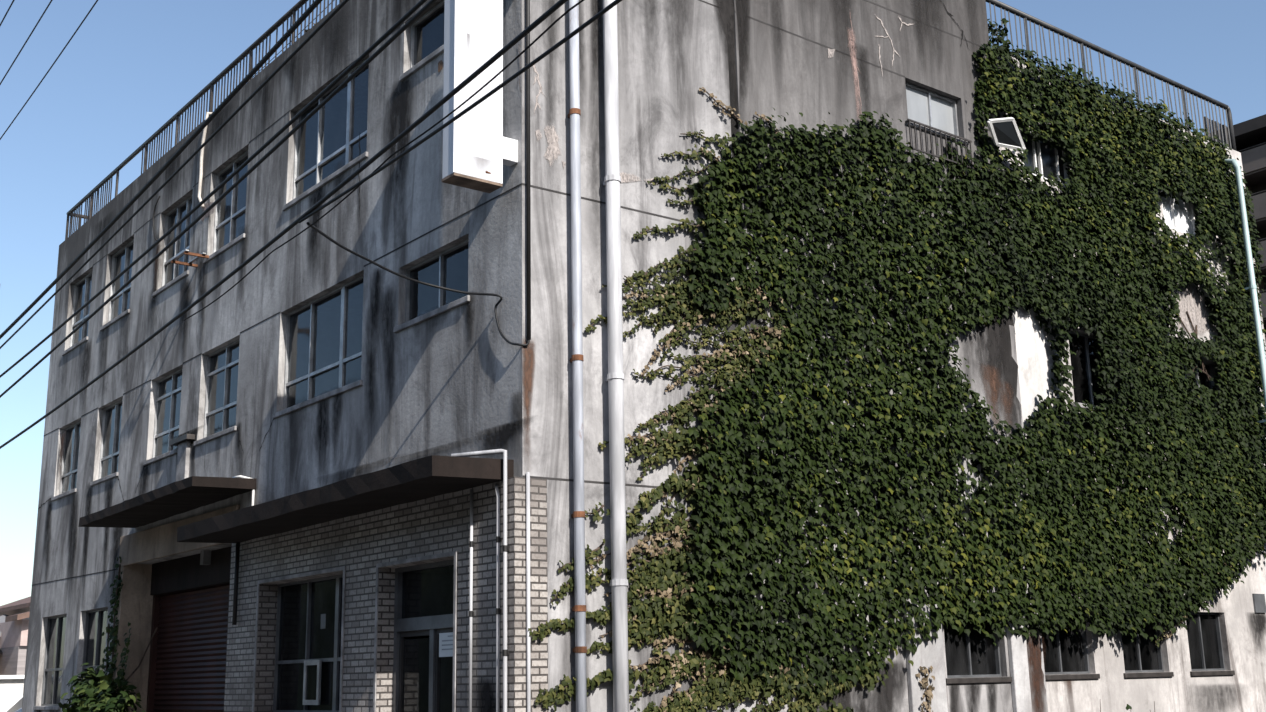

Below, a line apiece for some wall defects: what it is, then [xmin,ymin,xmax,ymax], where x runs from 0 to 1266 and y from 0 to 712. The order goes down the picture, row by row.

leakage [716,0,748,97]
leakage [836,0,868,106]
crack [848,12,913,121]
leakage [390,78,412,202]
leakage [309,175,340,266]
leakage [181,257,219,350]
leakage [81,328,108,394]
corrosion [523,340,534,431]
leakage [44,498,52,566]
leakage [69,481,112,577]
leakage [104,527,122,599]
leakage [951,683,996,712]